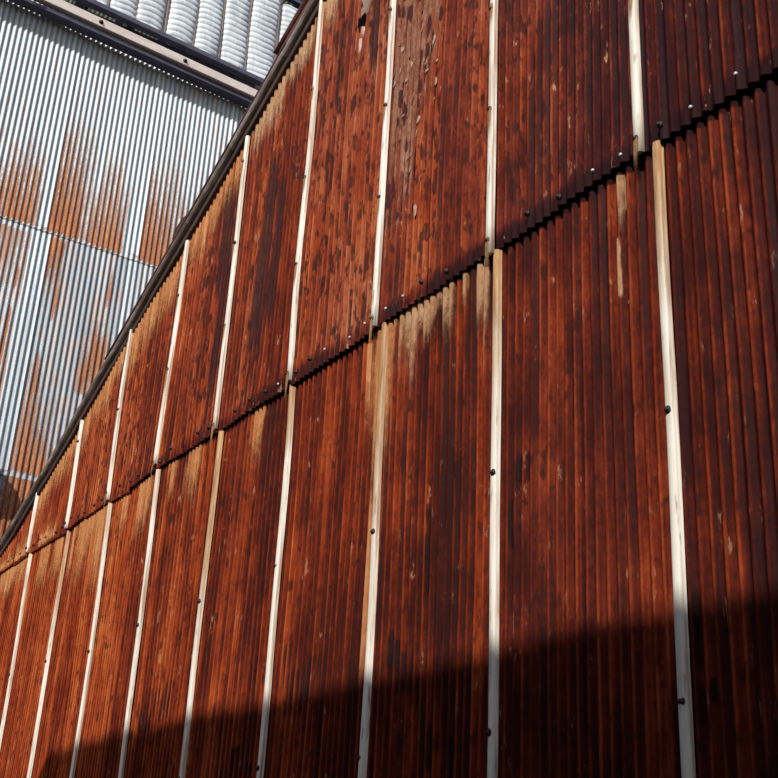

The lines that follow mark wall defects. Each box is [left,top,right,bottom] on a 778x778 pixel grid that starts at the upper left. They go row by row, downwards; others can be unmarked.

water stain [335,19,346,106]
water stain [358,0,380,70]
corrosion [0,137,129,317]
corrosion [137,185,184,266]
water stain [37,0,337,513]
corrosion [0,306,11,400]
corrosion [74,328,106,396]
corrosion [366,315,396,453]
corrosion [0,353,51,539]
water stain [120,475,153,524]
corrosion [359,503,381,671]
water stain [386,630,420,709]